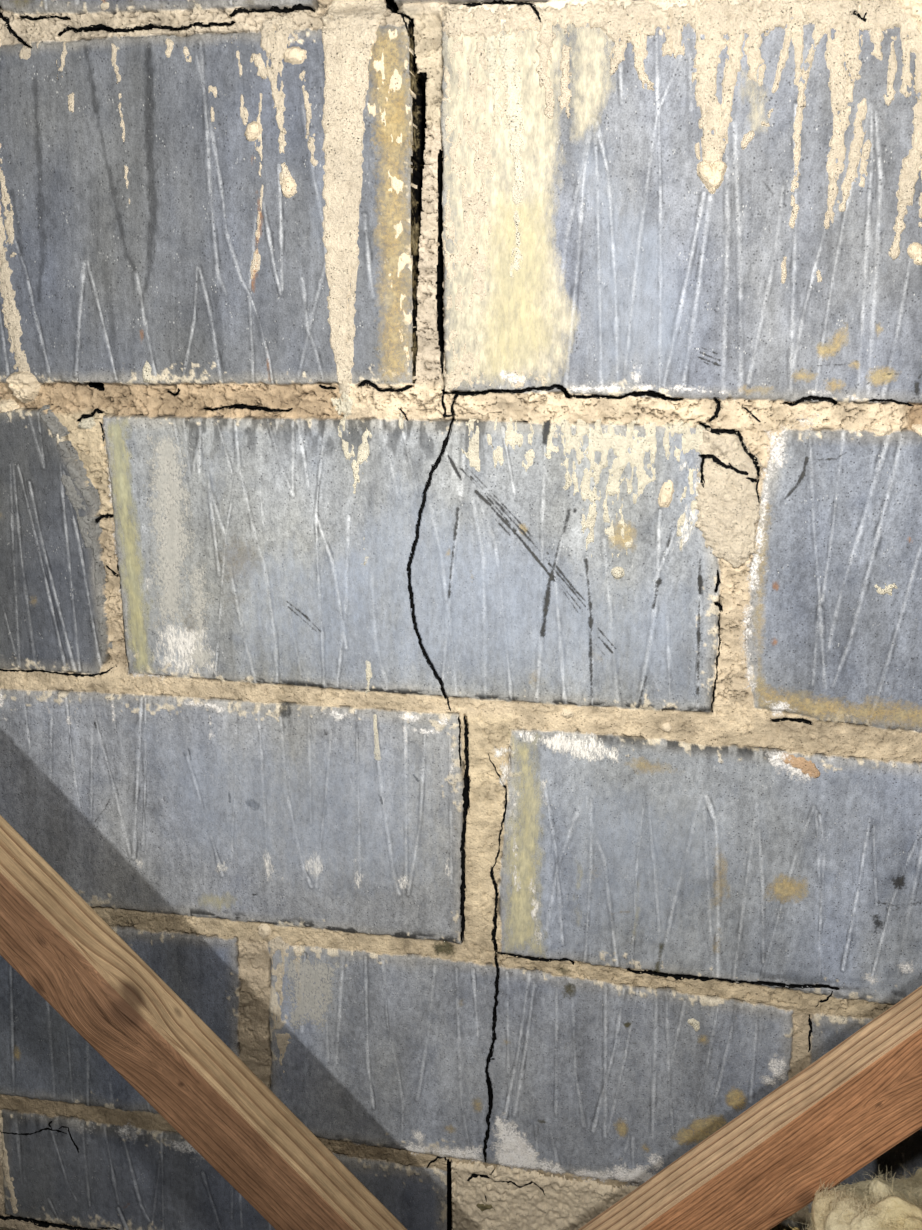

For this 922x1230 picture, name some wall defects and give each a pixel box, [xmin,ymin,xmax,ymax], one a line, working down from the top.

crack [0,3,314,48]
crack [853,10,867,22]
crack [785,396,838,406]
crack [868,398,914,406]
crack [699,398,761,503]
crack [319,0,683,1230]
crack [711,571,723,712]
crack [772,717,813,725]
crack [627,968,840,1052]
crack [0,1121,79,1153]